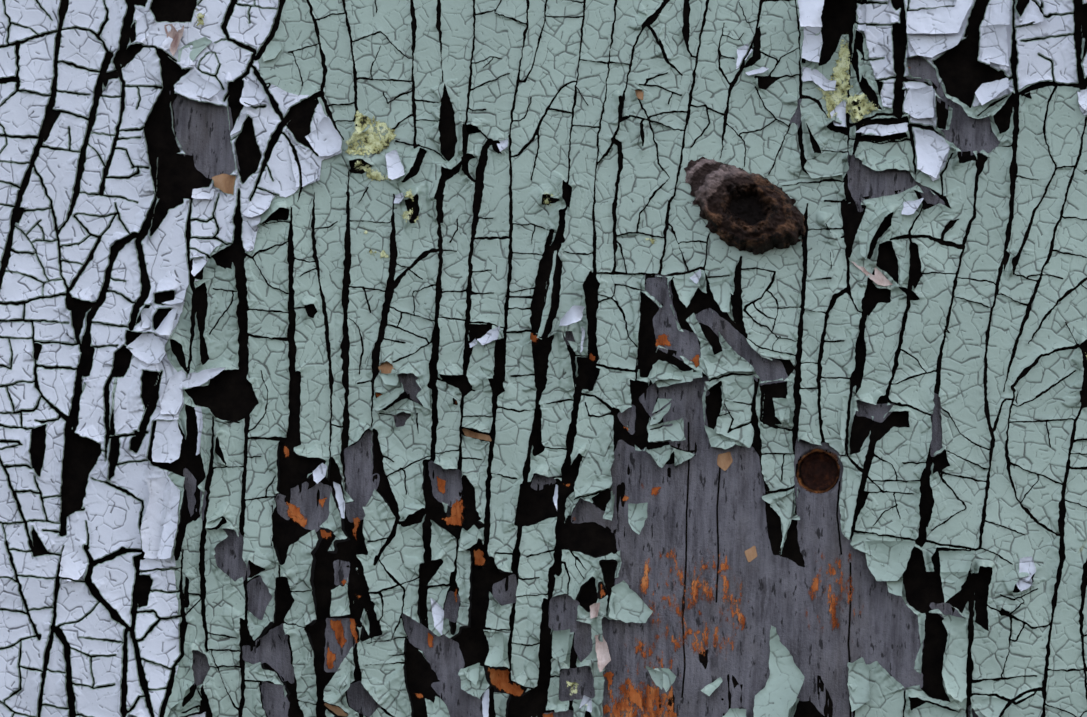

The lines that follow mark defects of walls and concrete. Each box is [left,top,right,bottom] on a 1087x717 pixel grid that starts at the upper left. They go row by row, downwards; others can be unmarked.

peeling [101,0,266,237]
peeling [242,190,292,225]
crack [185,0,791,698]
peeling [275,0,1044,717]
crack [709,0,1087,717]
peeling [30,425,46,476]
peeling [32,528,86,582]
peeling [65,243,304,717]
crack [298,648,332,717]
crack [356,707,395,717]
corrosion [603,548,749,717]
corrosion [806,553,861,631]